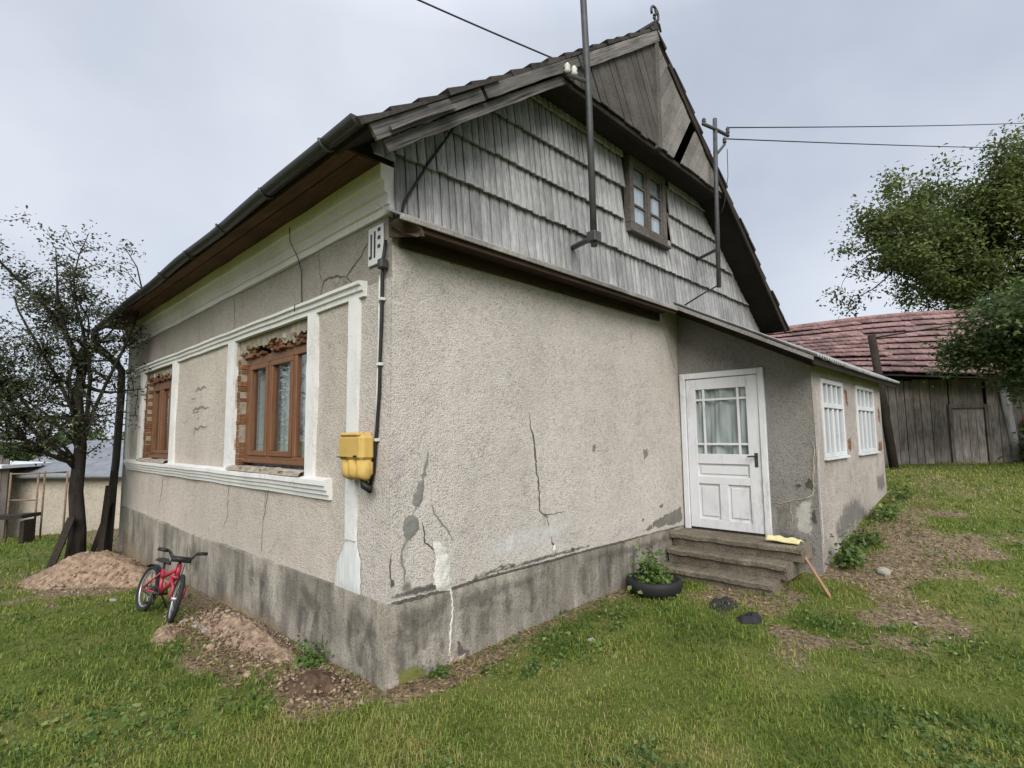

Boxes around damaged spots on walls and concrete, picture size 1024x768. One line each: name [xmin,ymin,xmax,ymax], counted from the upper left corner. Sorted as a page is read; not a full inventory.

water stain [396,583,436,597]
water stain [475,520,589,578]
crack [389,413,680,605]
flaking render [773,443,817,535]